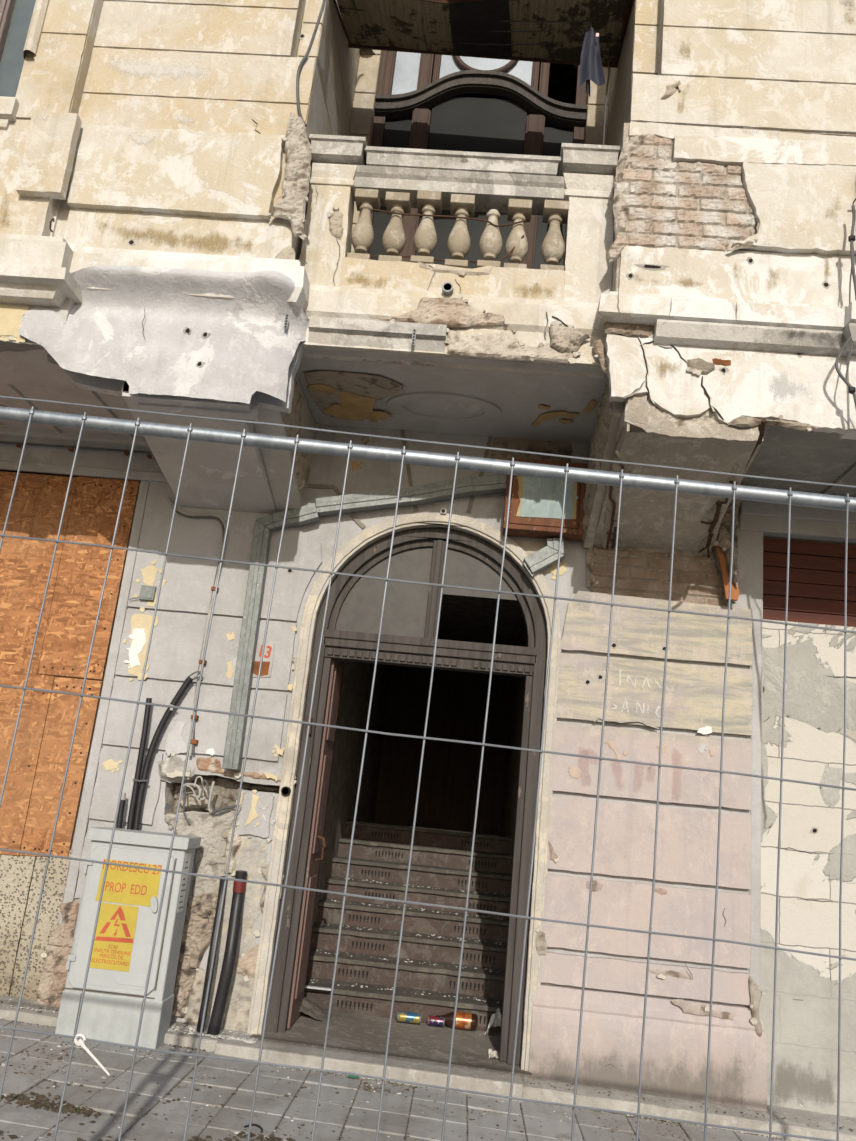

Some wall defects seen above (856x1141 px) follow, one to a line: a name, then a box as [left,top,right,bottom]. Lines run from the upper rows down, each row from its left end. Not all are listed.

flaking render [268,112,312,260]
flaking render [607,133,760,262]
peeling [0,305,59,365]
flaking render [281,371,404,500]
flaking render [374,295,820,607]
crack [624,337,724,420]
flaking render [158,716,297,1032]